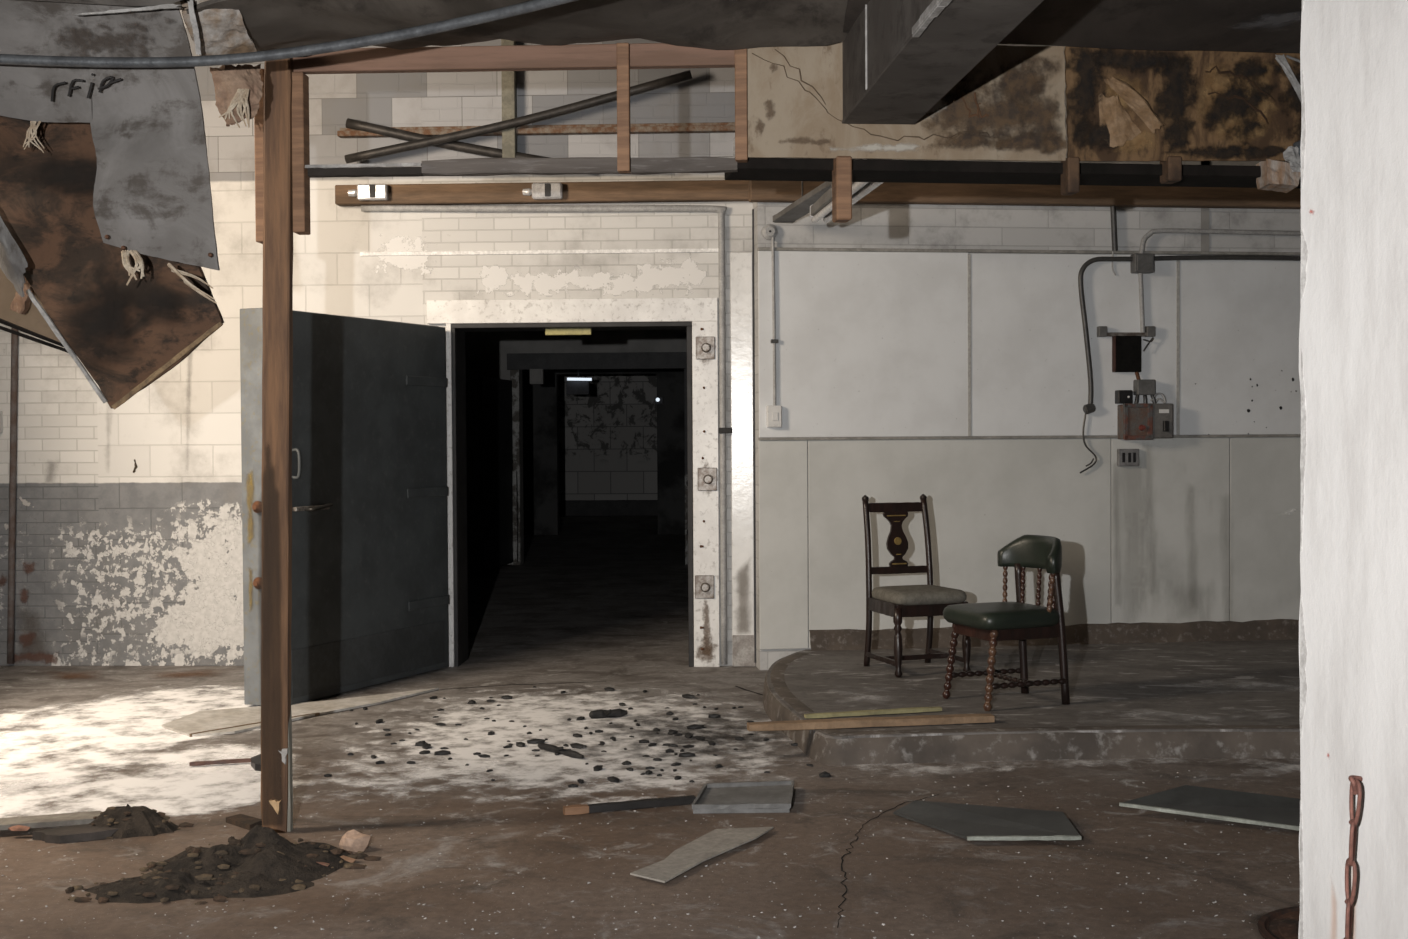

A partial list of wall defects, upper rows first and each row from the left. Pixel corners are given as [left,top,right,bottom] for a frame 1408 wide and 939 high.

crack [752,49,998,141]
damp [925,48,1301,160]
peeling [51,498,244,666]
crack [837,794,939,928]